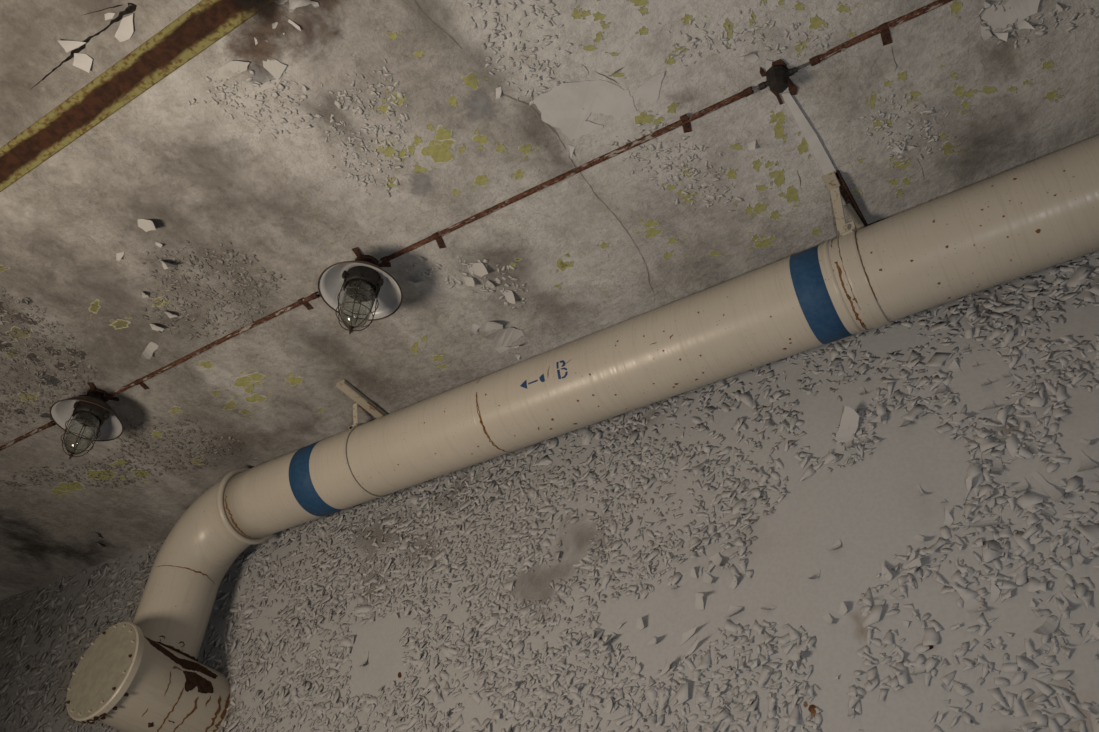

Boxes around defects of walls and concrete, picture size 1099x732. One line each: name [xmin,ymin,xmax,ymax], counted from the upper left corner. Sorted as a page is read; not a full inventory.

crack [30,3,137,90]
corrosion [229,8,338,65]
peeling [272,0,320,36]
peeling [187,57,539,198]
crack [497,84,654,292]
peeling [461,0,844,251]
peeling [110,219,286,359]
peeling [0,406,244,498]
peeling [32,543,163,732]